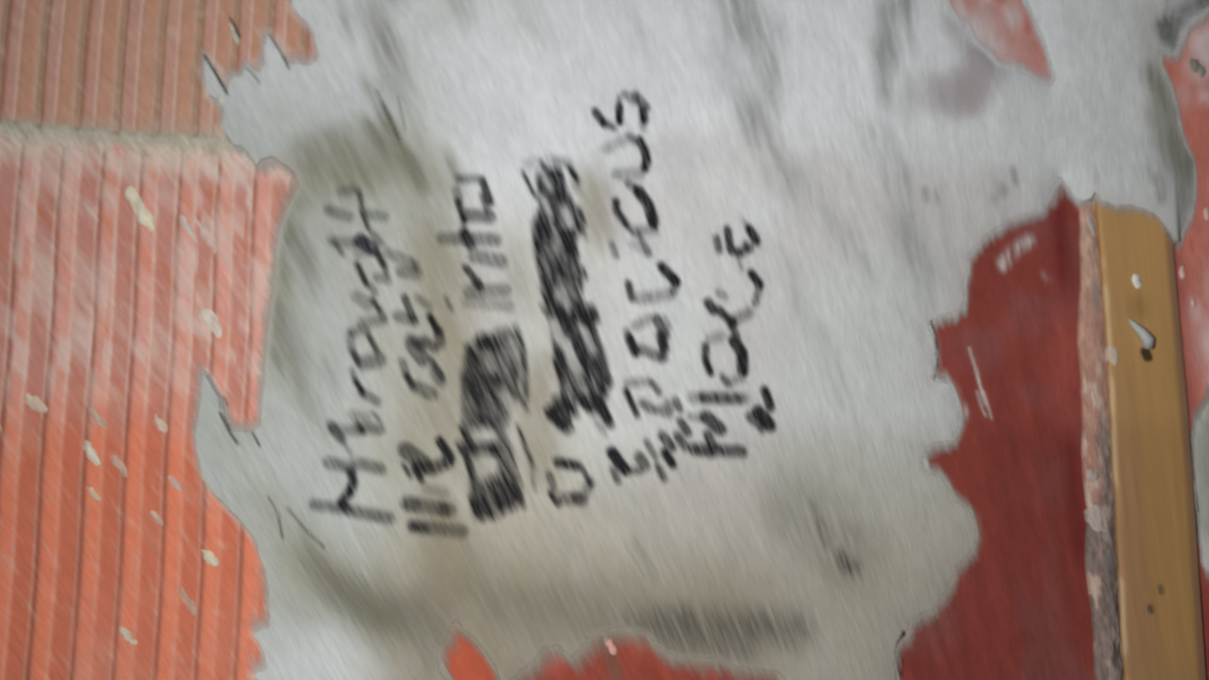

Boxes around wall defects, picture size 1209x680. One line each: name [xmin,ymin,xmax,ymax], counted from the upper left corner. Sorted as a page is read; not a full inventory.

flaking render [949,0,1051,80]
flaking render [0,0,318,680]
flaking render [444,632,498,680]
flaking render [524,635,776,680]
flaking render [898,185,1095,680]
flaking render [1163,14,1209,680]